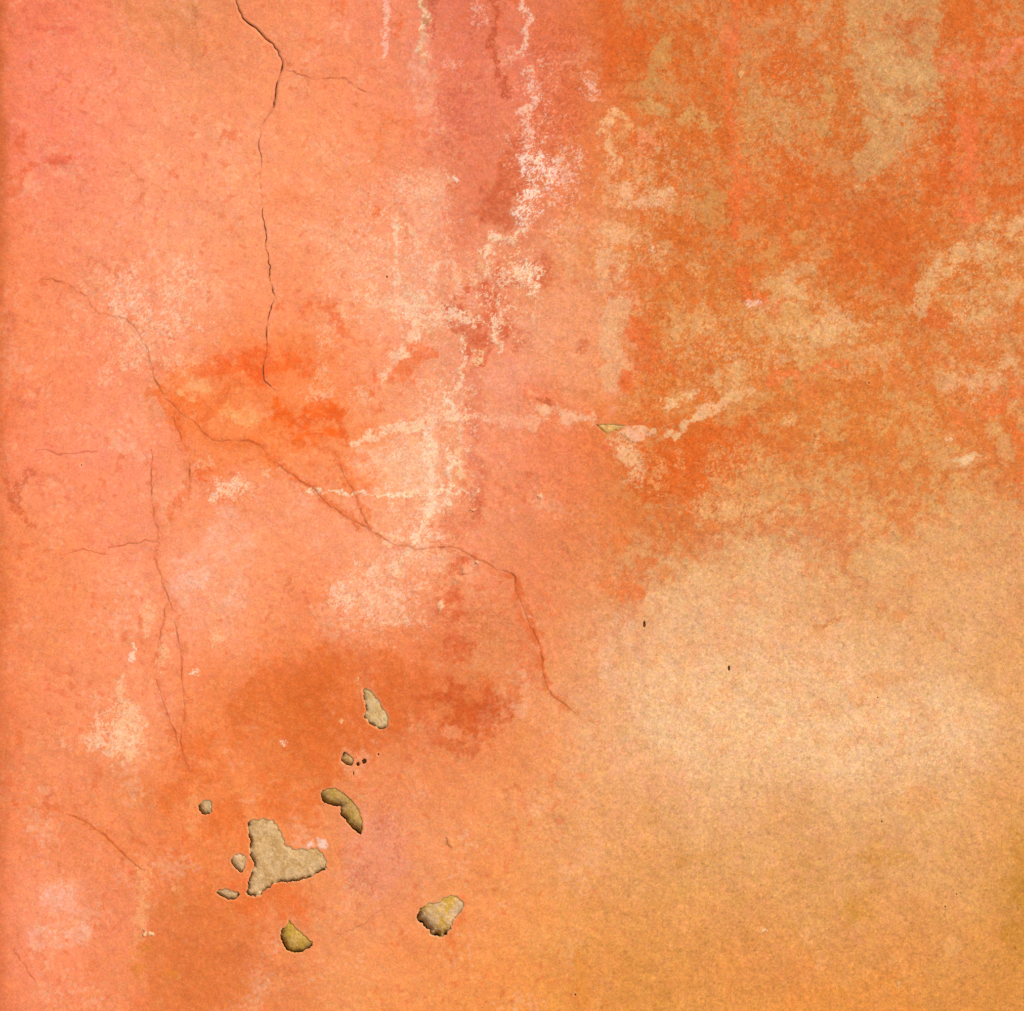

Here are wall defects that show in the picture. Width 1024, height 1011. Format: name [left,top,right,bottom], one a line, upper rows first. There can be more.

crack [233,0,373,392]
damp [46,0,660,928]
crack [33,271,582,772]
damp [583,423,1024,818]
spalling [360,685,392,732]
spalling [338,749,382,778]
spalling [196,797,215,818]
spalling [318,785,366,837]
spalling [213,815,330,903]
spalling [277,917,315,956]
spalling [414,892,467,940]